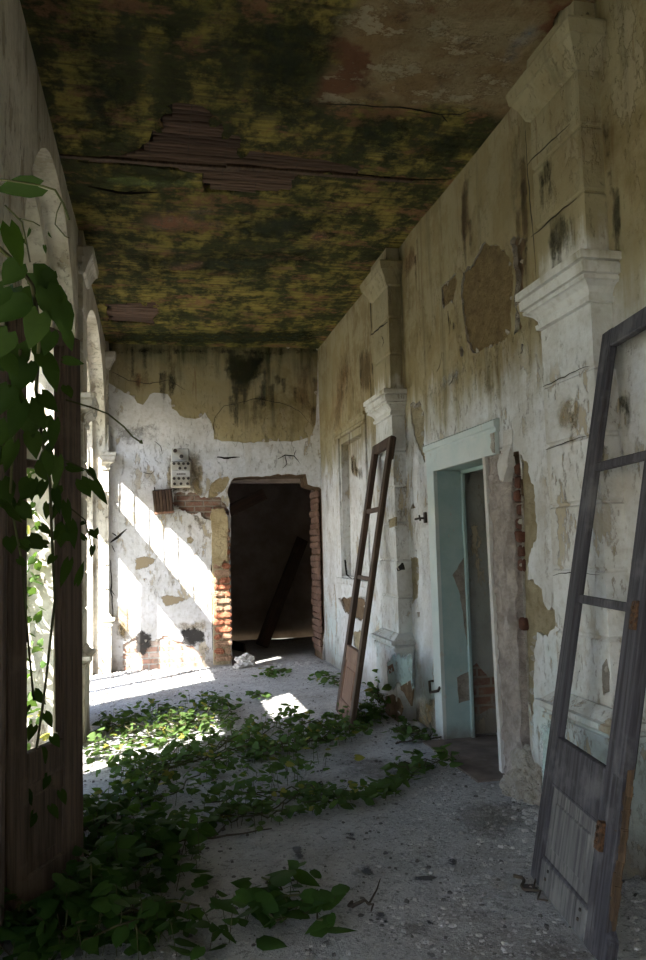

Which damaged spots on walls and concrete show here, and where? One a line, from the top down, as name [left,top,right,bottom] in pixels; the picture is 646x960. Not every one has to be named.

crack [318,103,477,121]
damp [462,184,472,259]
damp [516,162,528,271]
crack [525,128,574,272]
damp [550,217,565,268]
flaking render [441,236,526,357]
peeling [109,343,318,443]
damp [225,355,285,423]
flaking render [173,476,229,521]
peeling [161,595,185,606]
flaking render [339,596,365,650]
flaking render [490,429,555,716]